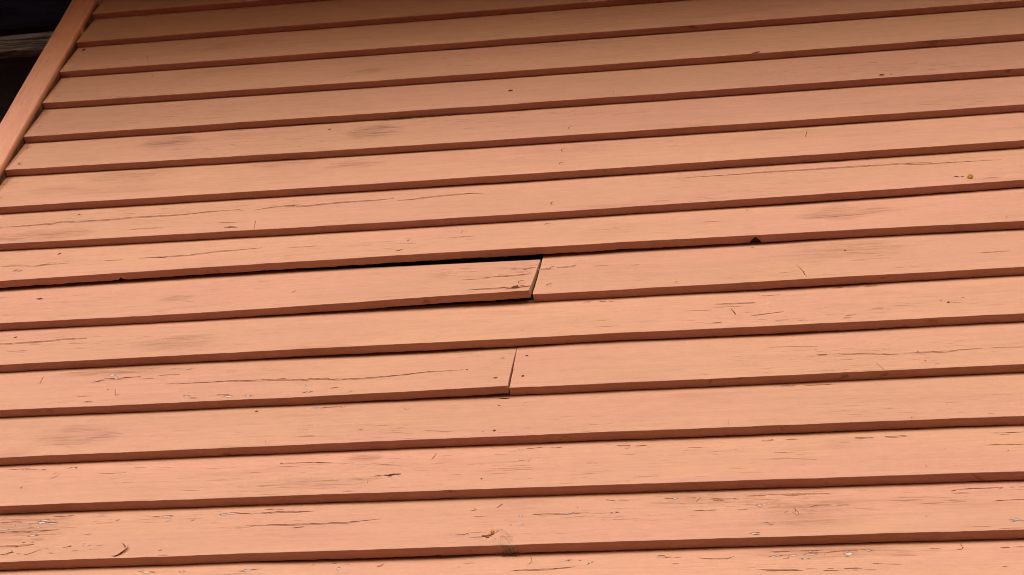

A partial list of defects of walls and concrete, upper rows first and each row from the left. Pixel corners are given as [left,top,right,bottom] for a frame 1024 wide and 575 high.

crack [78,368,464,397]